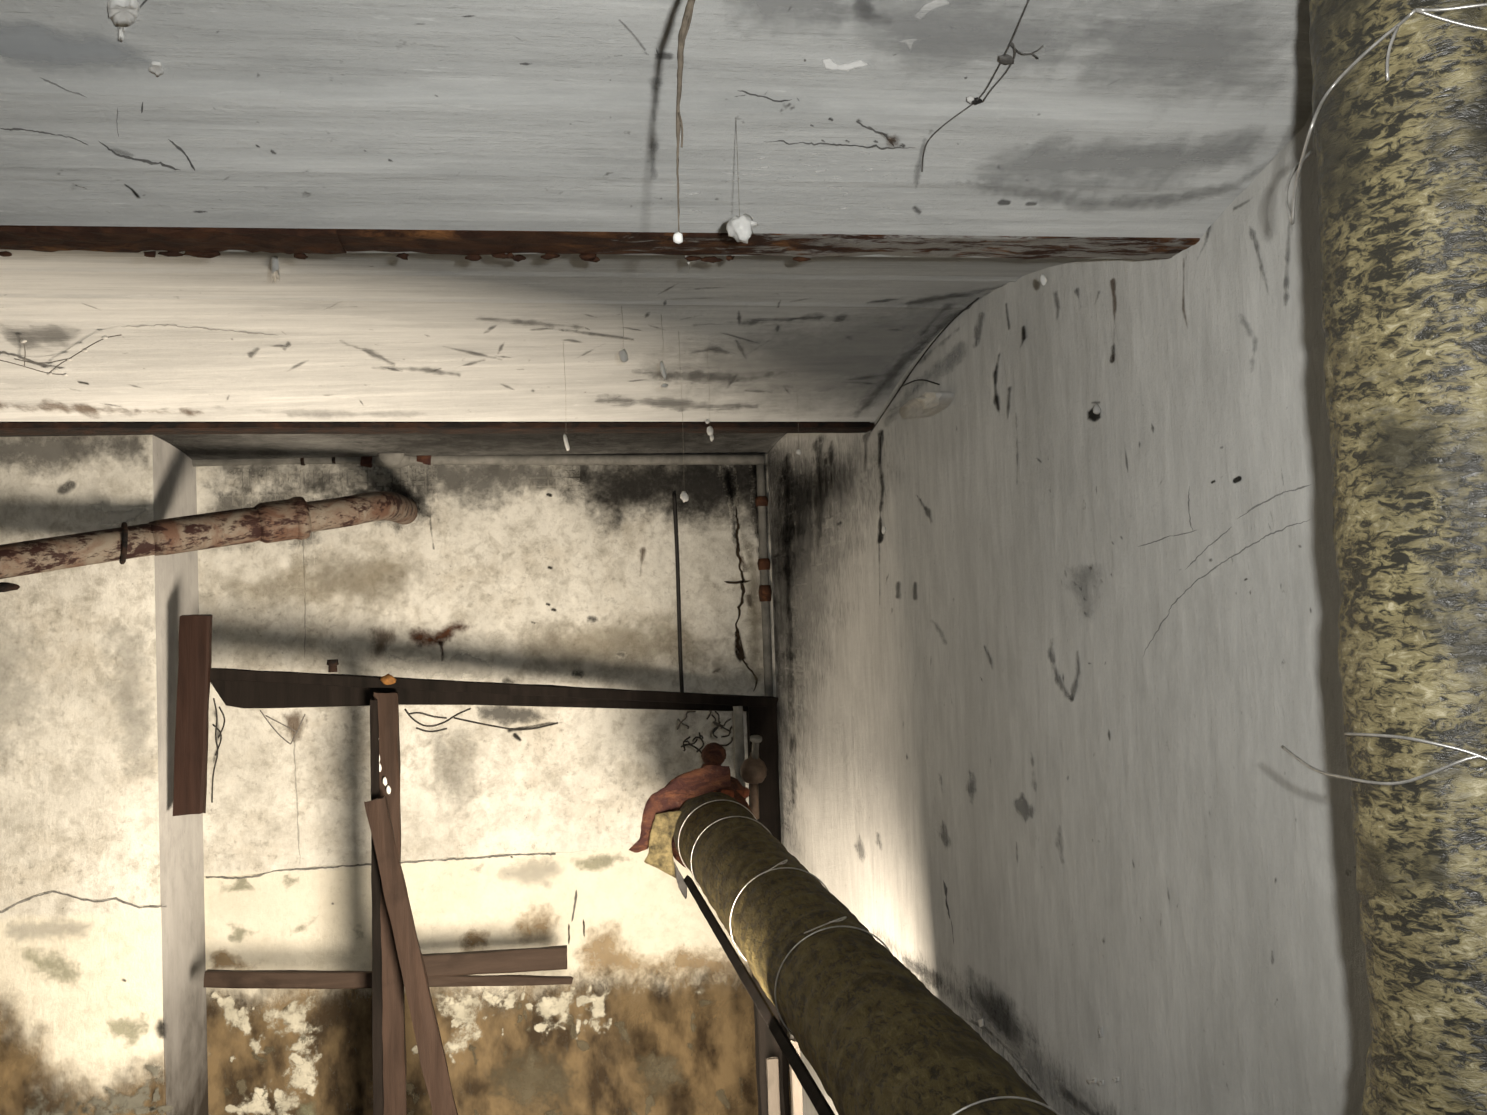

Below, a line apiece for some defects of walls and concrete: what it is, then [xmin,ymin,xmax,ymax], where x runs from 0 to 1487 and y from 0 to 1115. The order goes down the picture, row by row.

corrosion [465,253,560,262]
leakage [814,438,842,537]
crack [713,506,758,692]
crack [0,891,167,913]
leakage [212,930,244,968]
leakage [0,1002,166,1115]
leakage [206,988,373,1115]
leakage [404,987,433,1115]
leakage [429,933,758,1115]